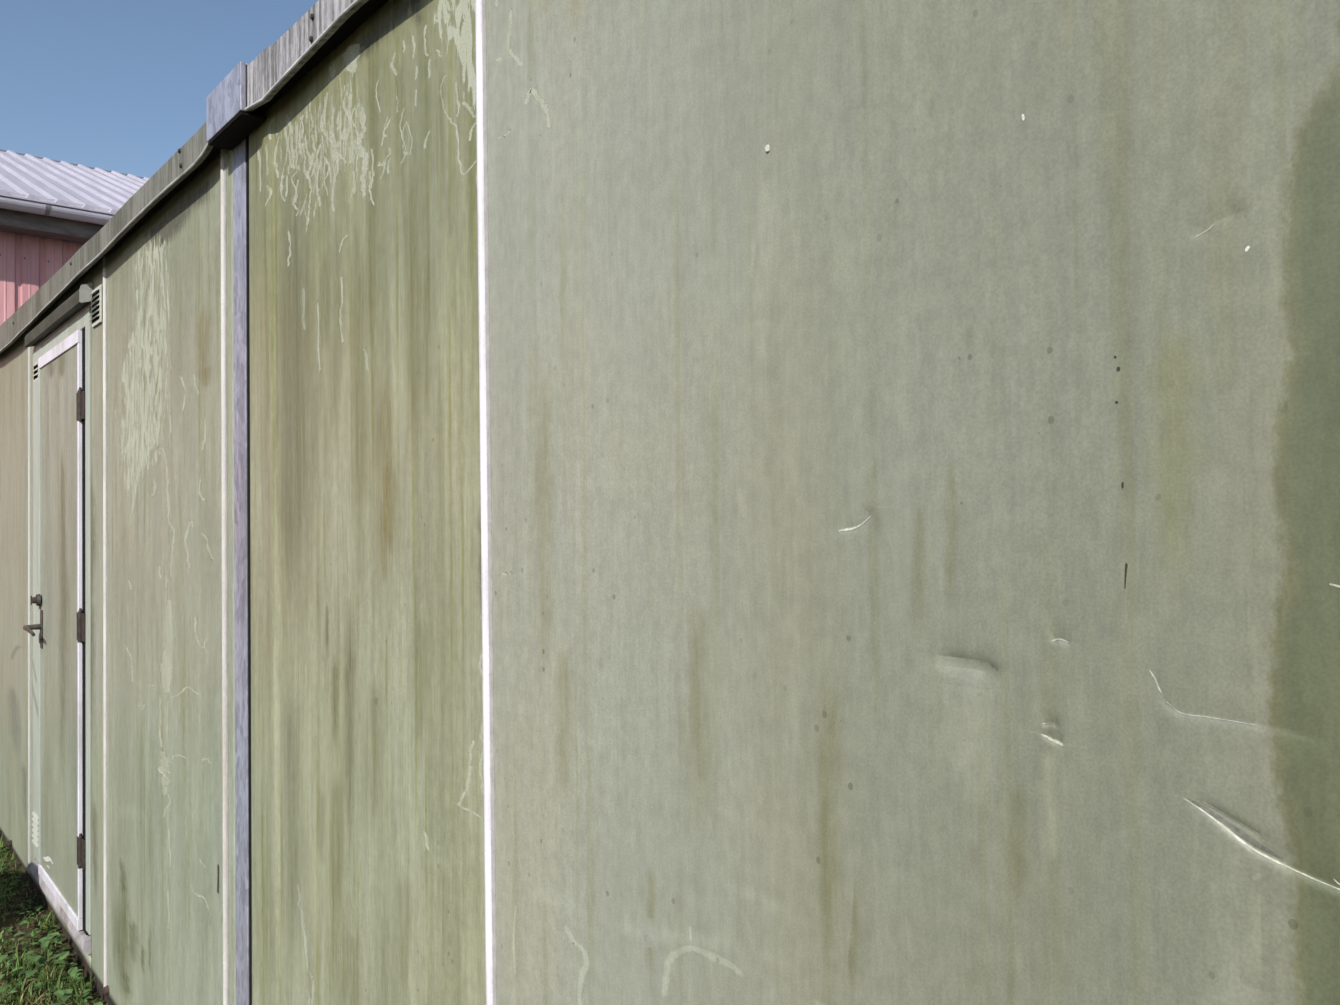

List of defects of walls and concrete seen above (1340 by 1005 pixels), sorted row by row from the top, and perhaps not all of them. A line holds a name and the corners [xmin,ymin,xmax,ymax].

damp [1196,0,1340,1005]